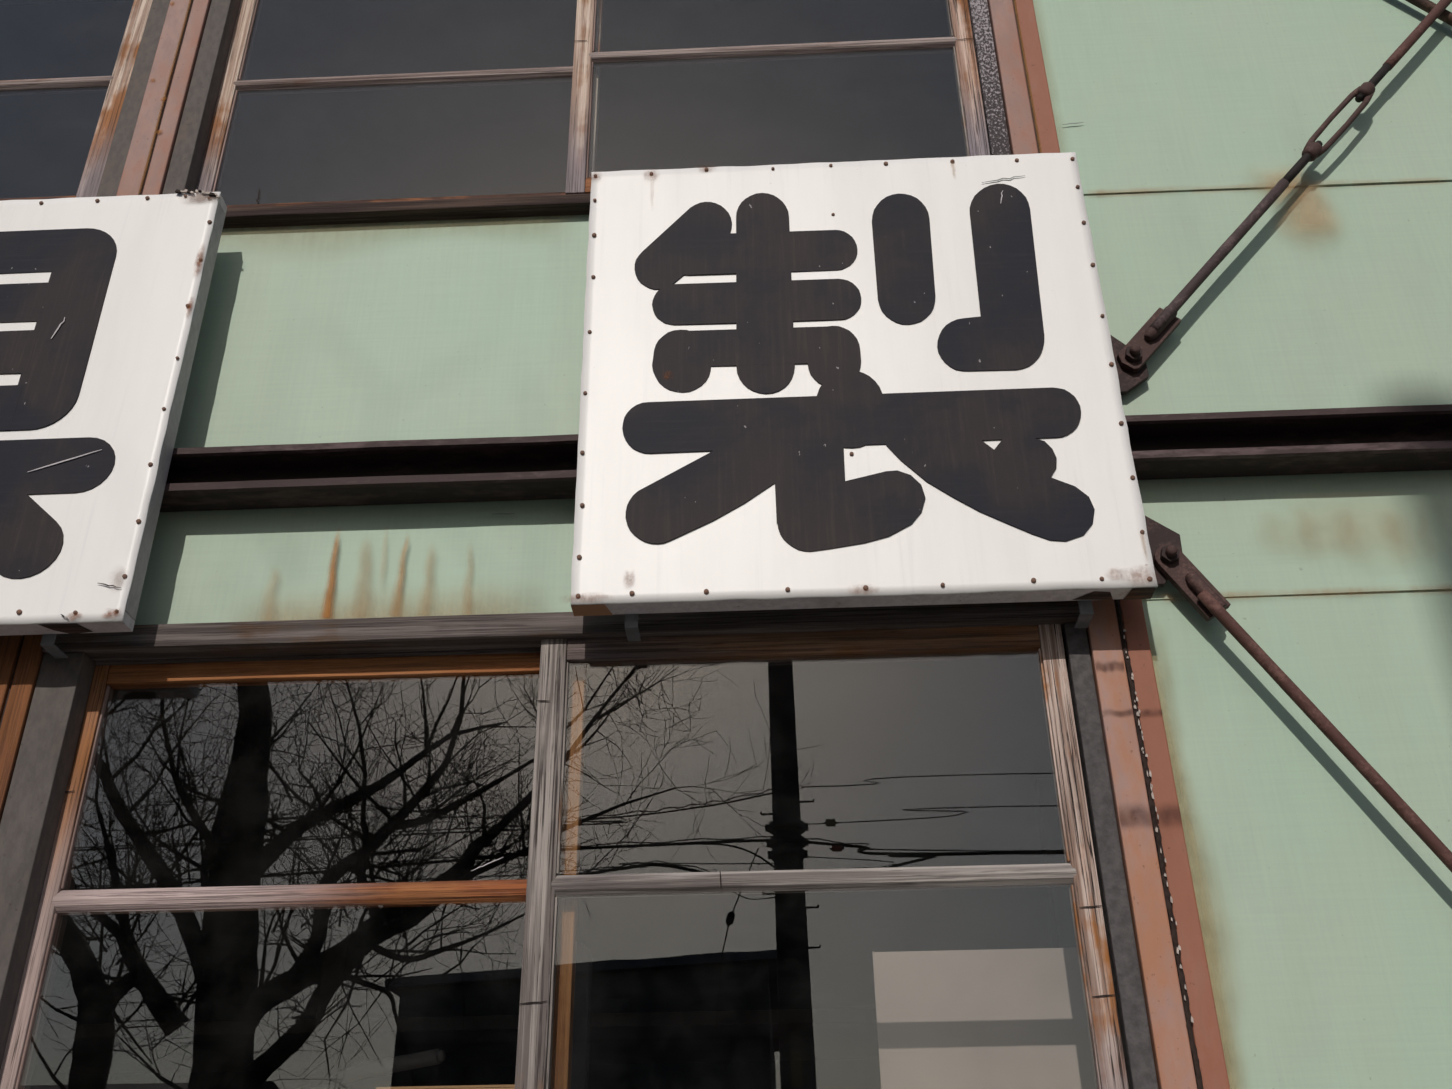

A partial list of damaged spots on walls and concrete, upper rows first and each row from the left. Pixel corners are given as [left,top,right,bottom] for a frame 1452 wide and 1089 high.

corrosion [322,539,338,618]